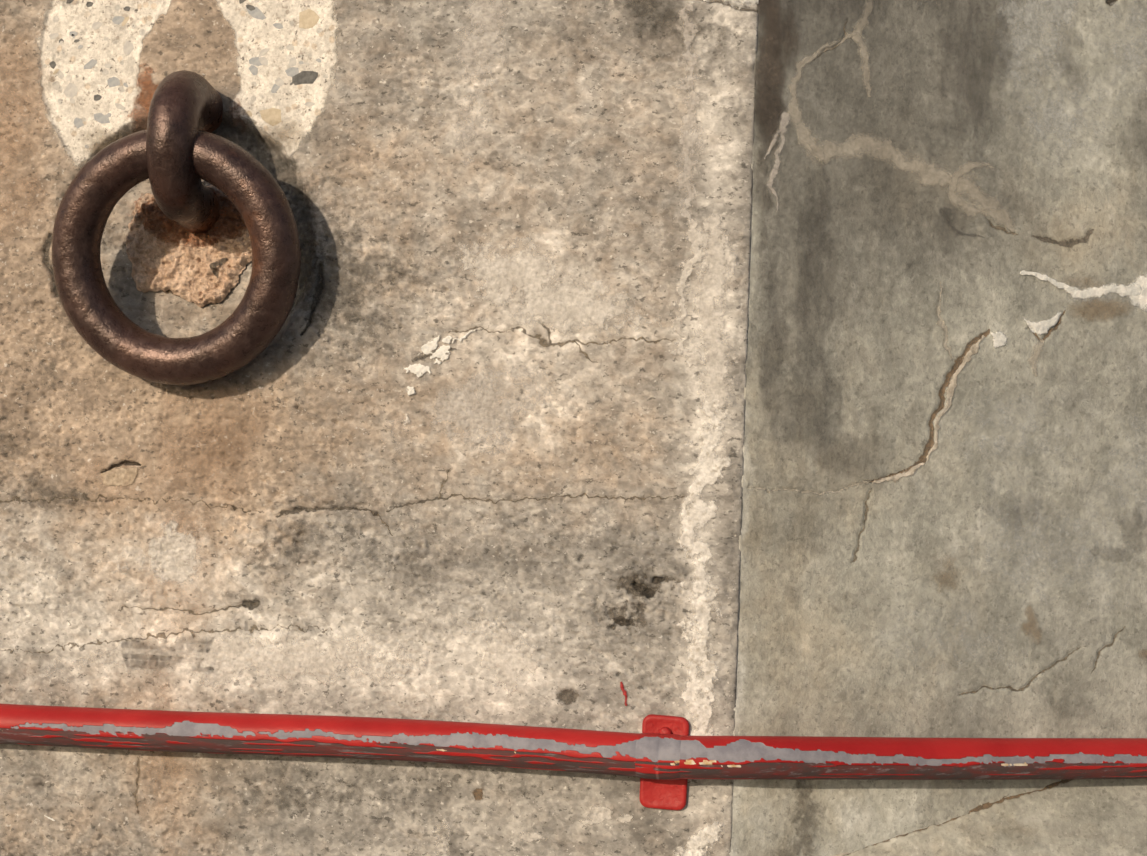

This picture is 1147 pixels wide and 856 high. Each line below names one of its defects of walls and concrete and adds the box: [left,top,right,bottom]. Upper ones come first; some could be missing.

corrosion [131,69,158,133]
leakage [755,0,794,141]
crack [764,0,1094,247]
crack [448,320,675,363]
crack [748,282,990,562]
crack [0,468,684,536]
crack [959,626,1125,695]
crack [832,779,1073,856]